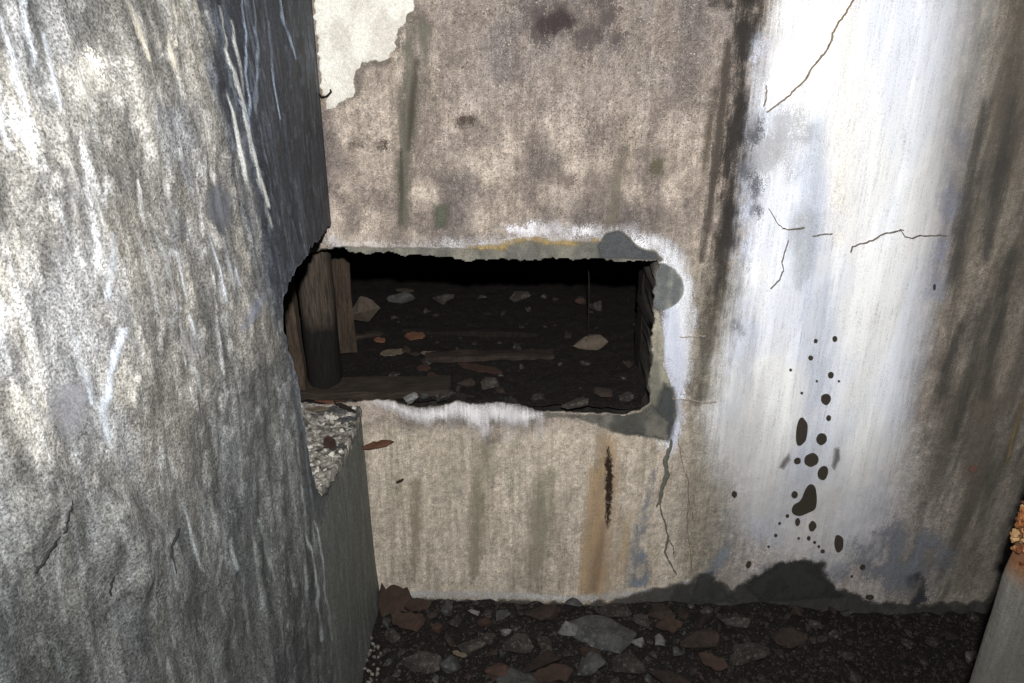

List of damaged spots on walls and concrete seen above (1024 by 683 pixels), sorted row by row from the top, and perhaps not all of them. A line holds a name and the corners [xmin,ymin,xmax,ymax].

peeling [313,0,418,110]
crack [763,0,854,113]
spalling [345,230,684,440]
water stain [373,0,990,615]
crack [769,209,947,289]
rust [580,435,617,602]
crack [656,432,695,575]